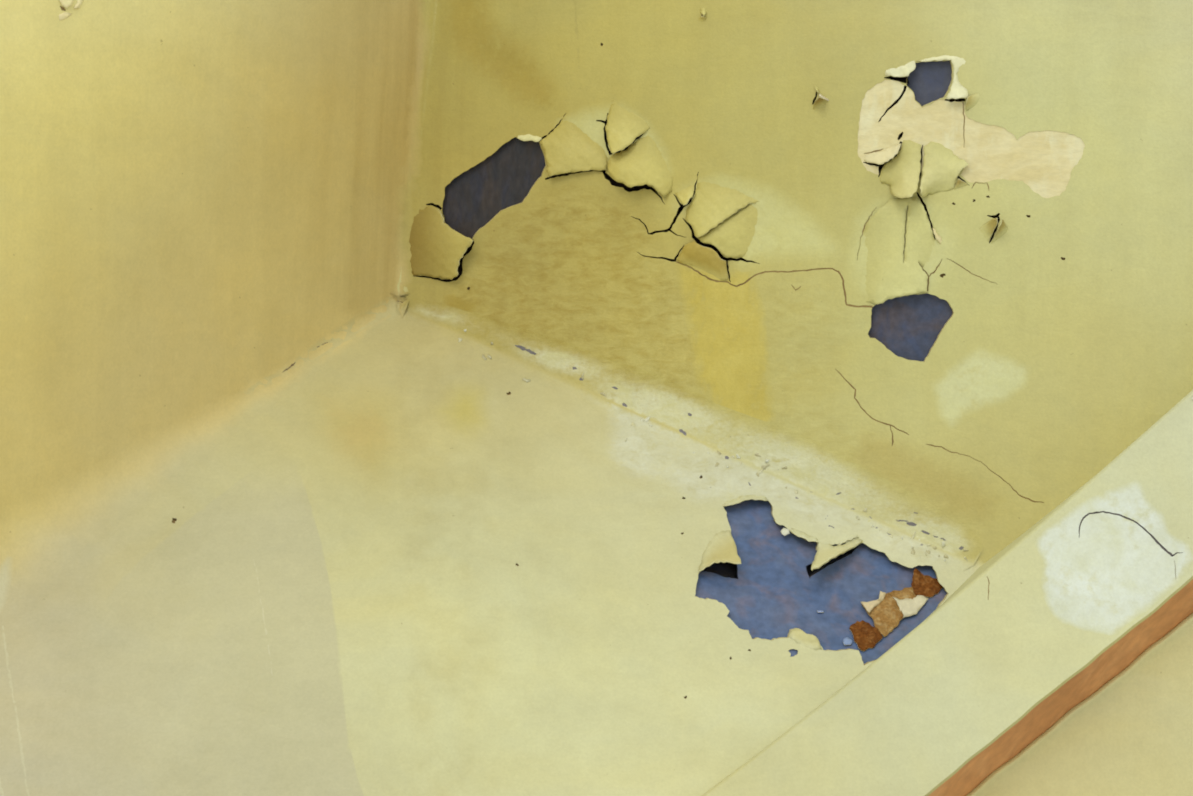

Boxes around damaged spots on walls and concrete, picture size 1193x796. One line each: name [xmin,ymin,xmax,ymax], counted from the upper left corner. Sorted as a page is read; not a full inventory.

crack [631,172,877,308]
peeling [517,55,1085,304]
crack [903,211,997,291]
crack [836,370,1044,503]
peeling [843,568,943,651]
crack [1079,511,1183,577]